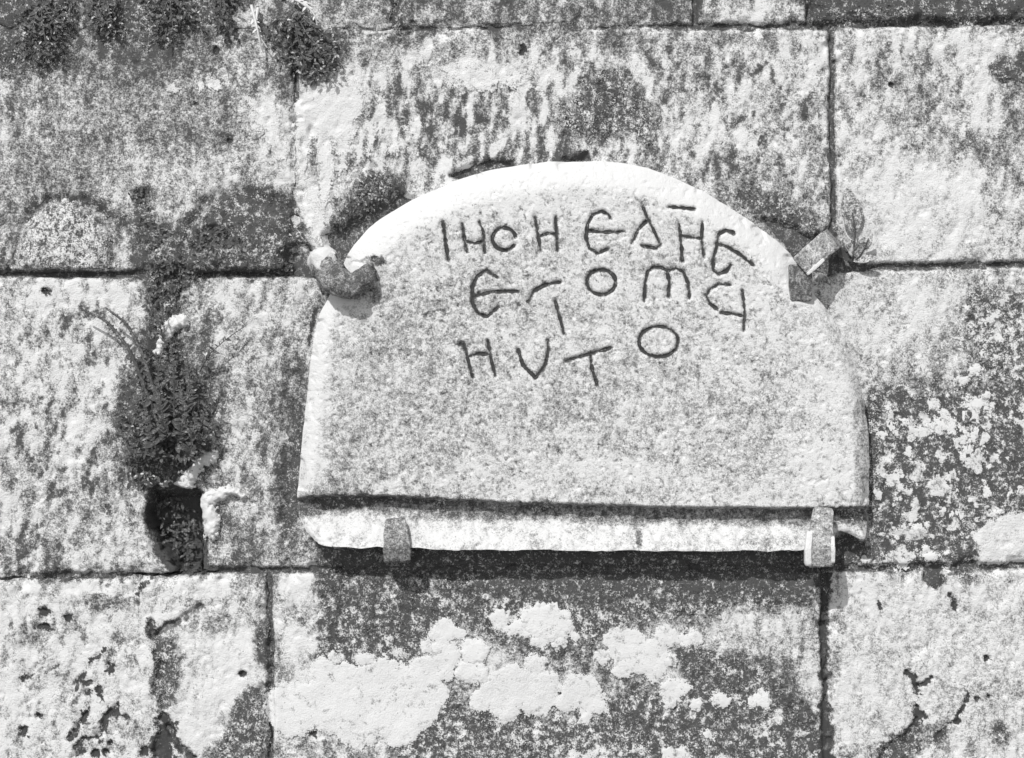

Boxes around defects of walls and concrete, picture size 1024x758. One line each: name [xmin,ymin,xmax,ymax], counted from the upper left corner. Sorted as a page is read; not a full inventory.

damp [549,59,667,162]
damp [448,153,516,179]
damp [719,176,839,250]
damp [276,266,1024,758]